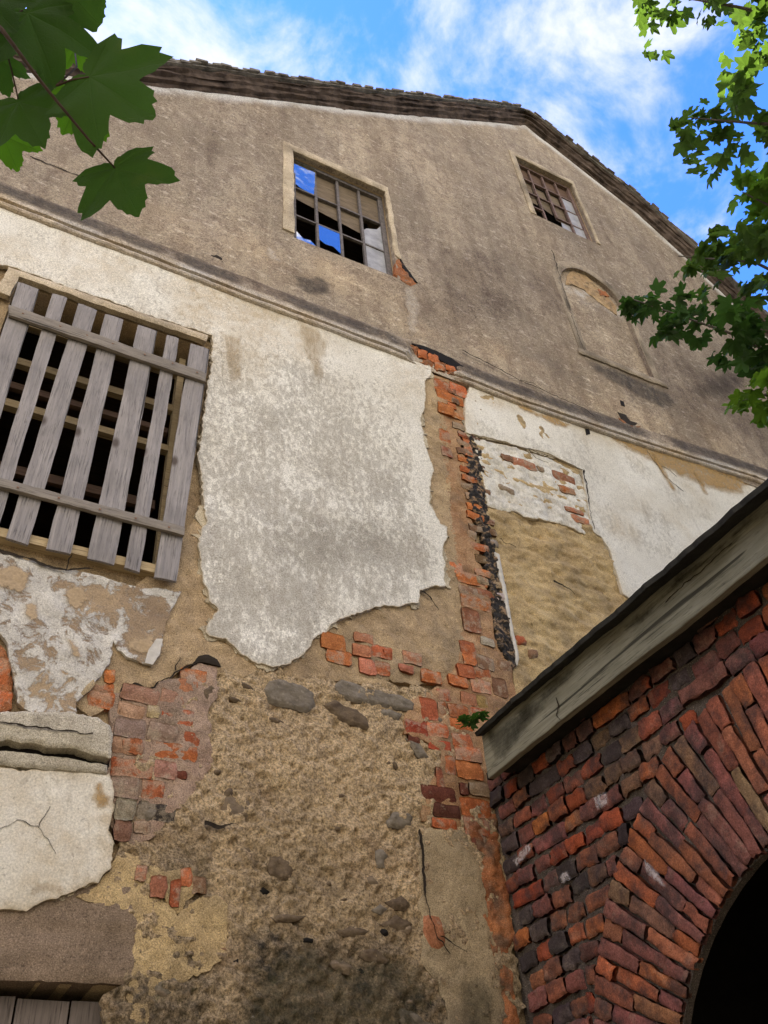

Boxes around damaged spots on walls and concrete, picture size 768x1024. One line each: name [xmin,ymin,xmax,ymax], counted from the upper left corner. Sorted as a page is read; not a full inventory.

flaking render [393,258,418,286]
flaking render [0,343,627,1024]
crack [418,829,467,954]